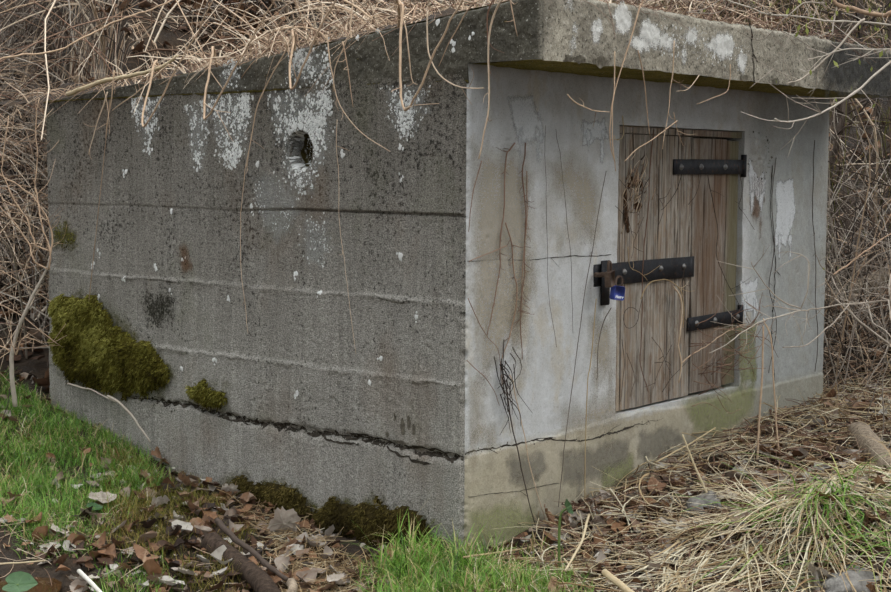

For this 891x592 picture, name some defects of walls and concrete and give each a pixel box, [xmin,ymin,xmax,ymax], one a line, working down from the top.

damp [131,96,164,157]
damp [183,58,254,172]
damp [138,286,178,338]
crack [133,396,663,465]